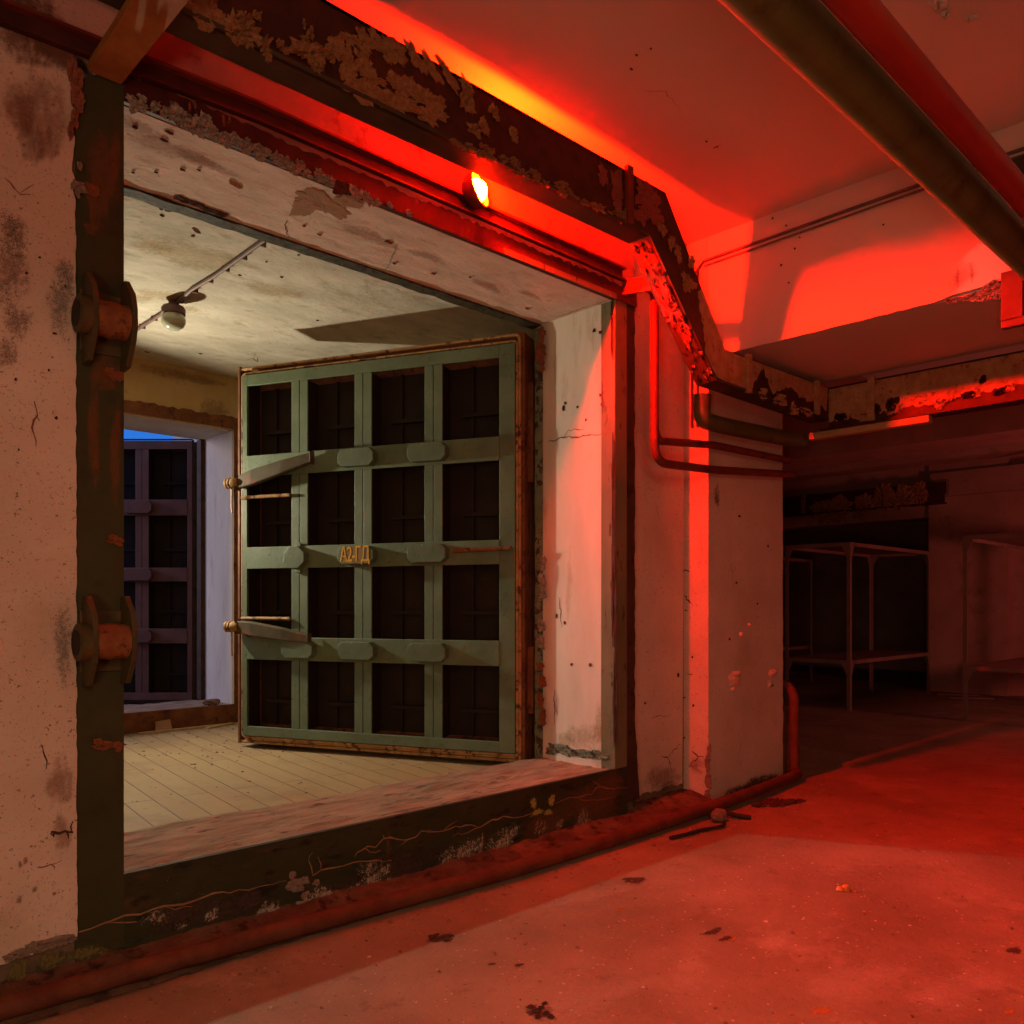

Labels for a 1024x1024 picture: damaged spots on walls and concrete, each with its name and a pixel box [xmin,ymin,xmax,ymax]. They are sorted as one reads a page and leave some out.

spalling [125,93,412,227]
peeling [184,0,714,382]
damp [0,213,28,367]
peeling [758,375,814,417]
peeling [915,387,981,410]
crack [548,426,611,442]
crack [79,881,283,933]